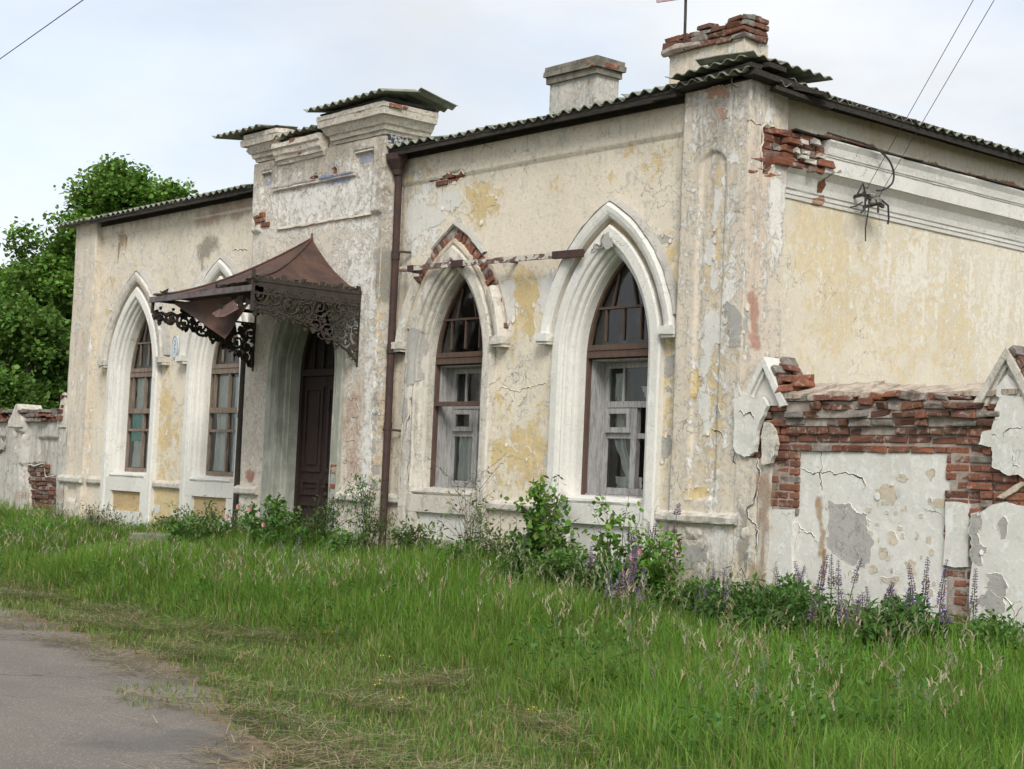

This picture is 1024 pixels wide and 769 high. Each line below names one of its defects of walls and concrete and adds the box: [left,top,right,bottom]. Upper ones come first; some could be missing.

flaking render [748,123,836,177]
flaking render [252,212,270,228]
flaking render [402,169,556,463]
spalling [687,187,750,437]
crack [497,383,549,411]
spalling [663,354,675,394]
flaking render [26,463,56,513]
spalling [660,433,672,466]
crack [702,427,761,554]
crack [798,452,867,492]
spalling [825,473,947,610]
spalling [968,511,1009,617]